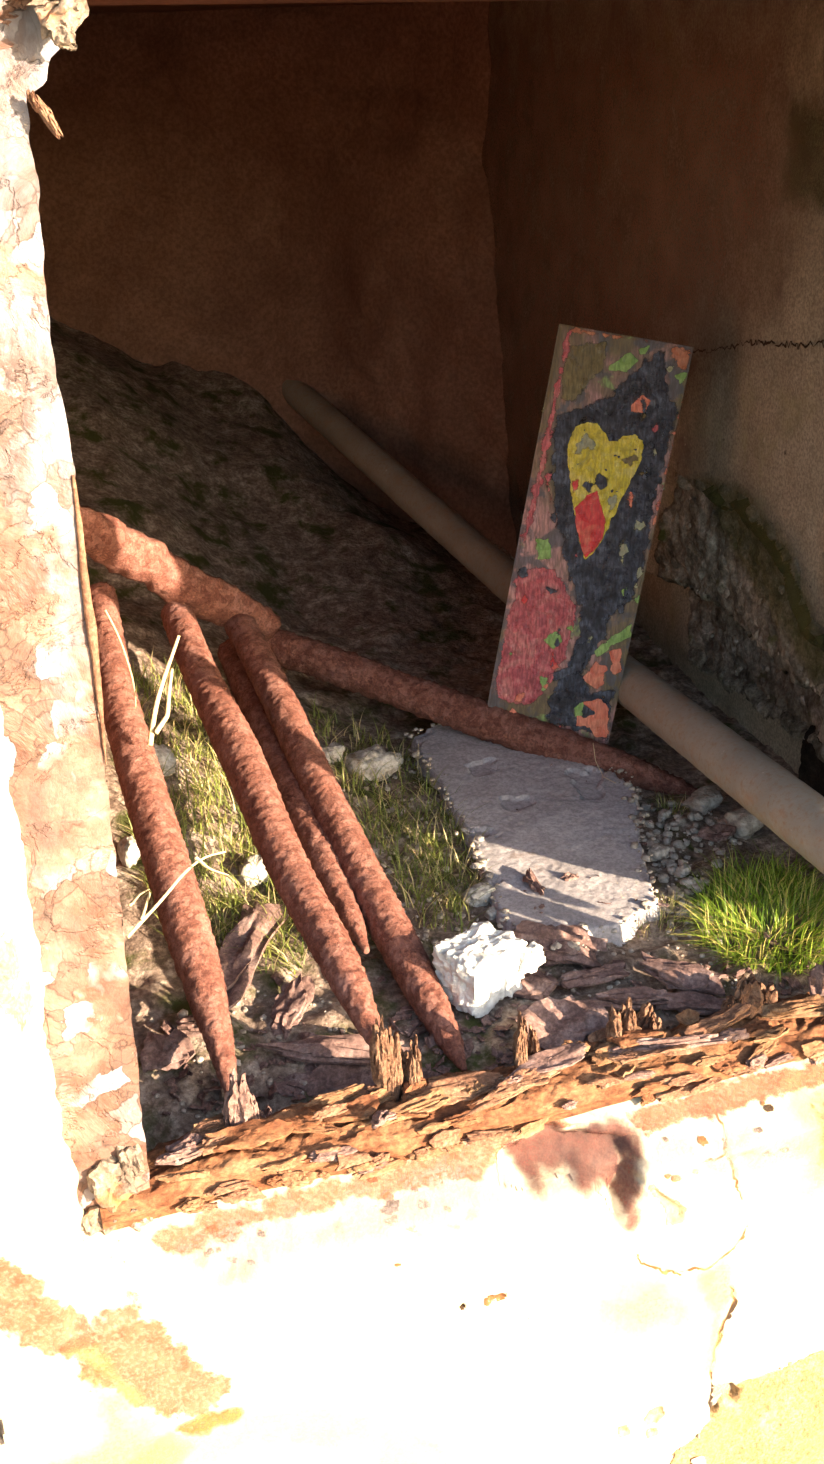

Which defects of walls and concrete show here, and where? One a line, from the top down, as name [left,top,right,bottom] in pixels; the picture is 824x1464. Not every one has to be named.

crack [693,339,824,354]
flaking render [654,470,824,797]
rust [627,1063,824,1137]
crack [637,1110,748,1412]
rust [0,1257,232,1419]
spalling [618,1406,665,1439]
flaking render [670,1350,824,1464]